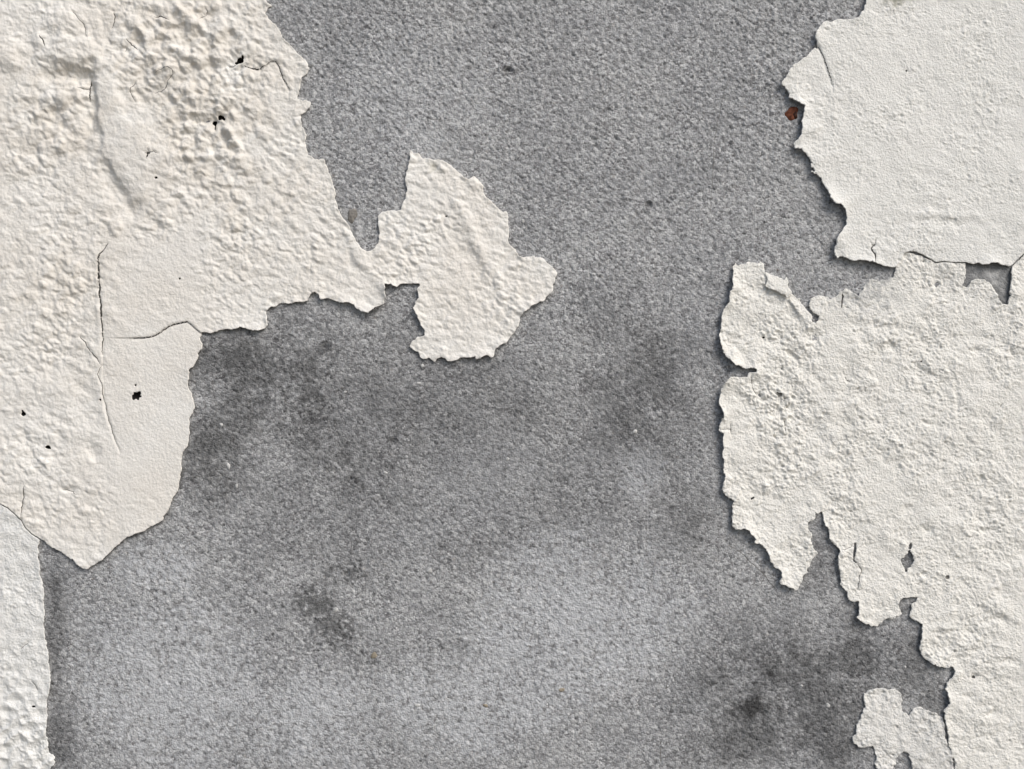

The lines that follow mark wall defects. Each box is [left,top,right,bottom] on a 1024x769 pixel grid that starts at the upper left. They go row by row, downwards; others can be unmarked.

corrosion [785,106,798,121]
crack [80,244,120,451]
crack [135,321,197,339]
peeling [0,0,557,769]
peeling [719,0,1024,769]